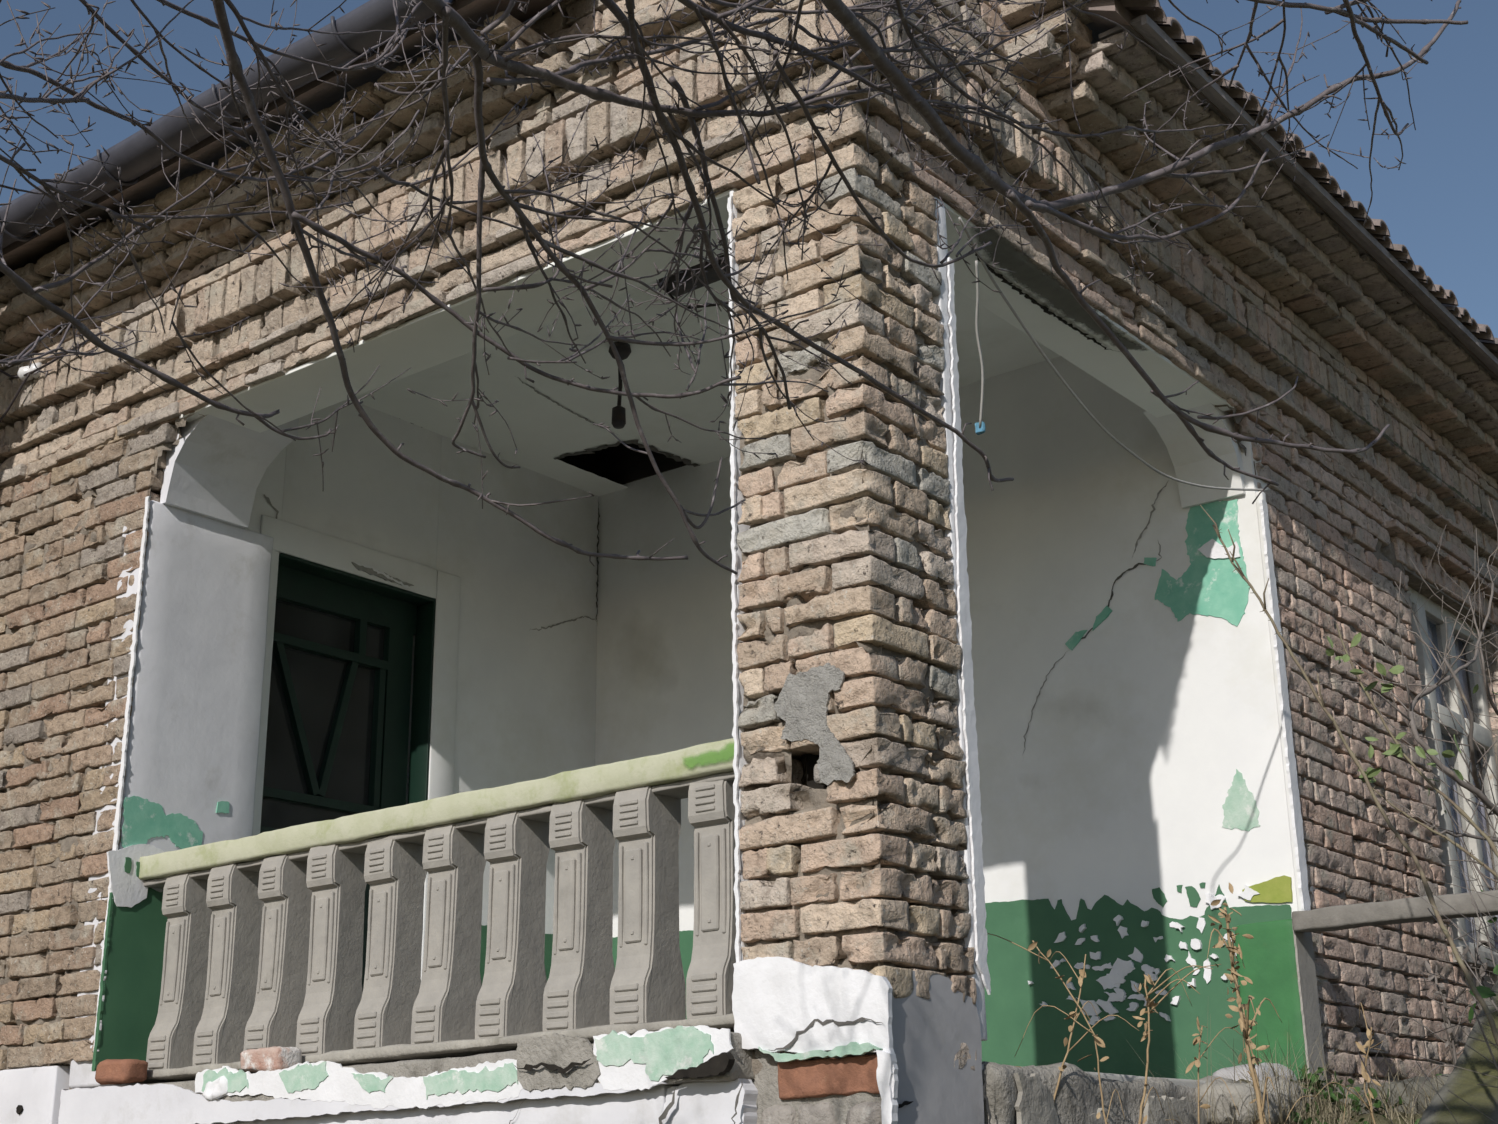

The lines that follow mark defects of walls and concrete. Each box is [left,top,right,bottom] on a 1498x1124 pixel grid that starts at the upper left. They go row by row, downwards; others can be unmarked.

peeling [1155,499,1250,626]
crack [1023,480,1169,753]
peeling [1222,769,1261,831]
peeling [107,796,203,908]
peeling [1050,875,1293,1025]
peeling [195,1025,735,1109]
crack [658,1088,676,1124]
crack [731,1076,743,1124]
crack [770,1017,883,1051]